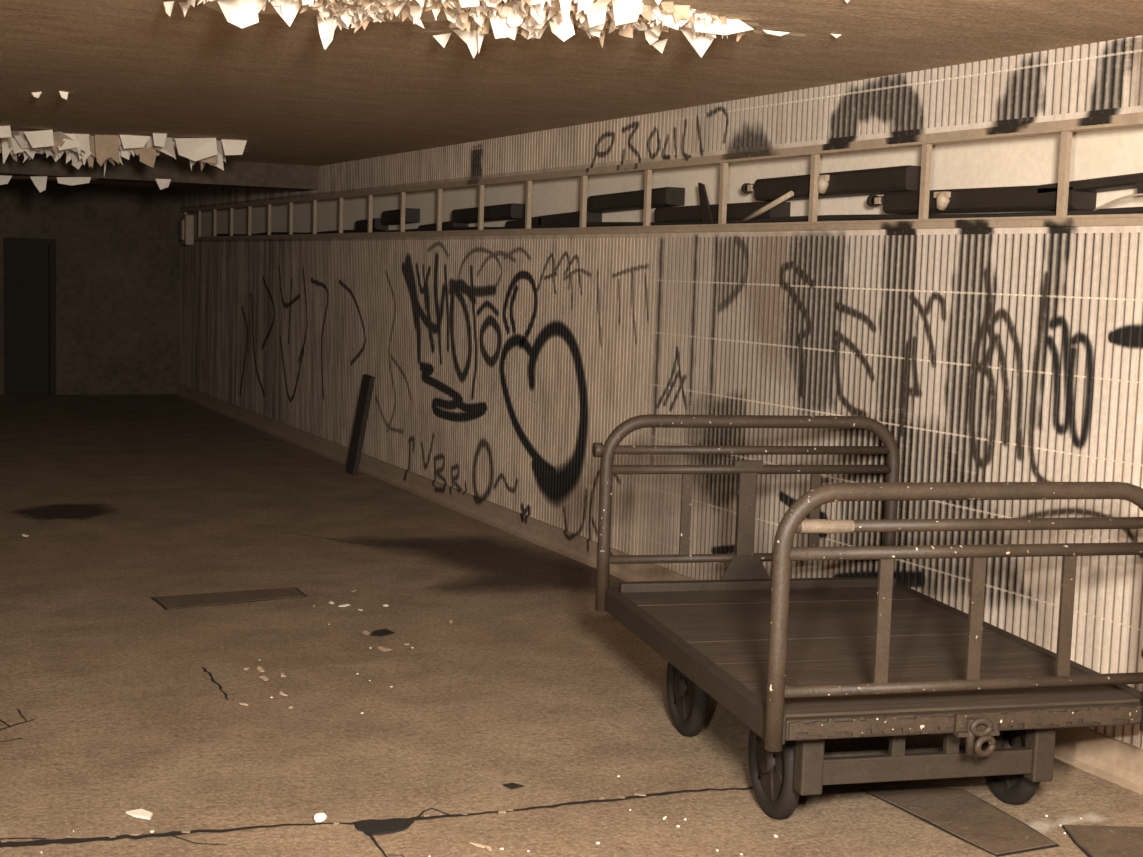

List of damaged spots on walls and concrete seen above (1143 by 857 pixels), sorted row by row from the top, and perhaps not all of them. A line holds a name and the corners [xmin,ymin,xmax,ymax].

peeling [163,0,807,58]
peeling [0,126,250,192]
crack [202,667,229,700]
crack [0,709,37,742]
crack [0,786,753,857]